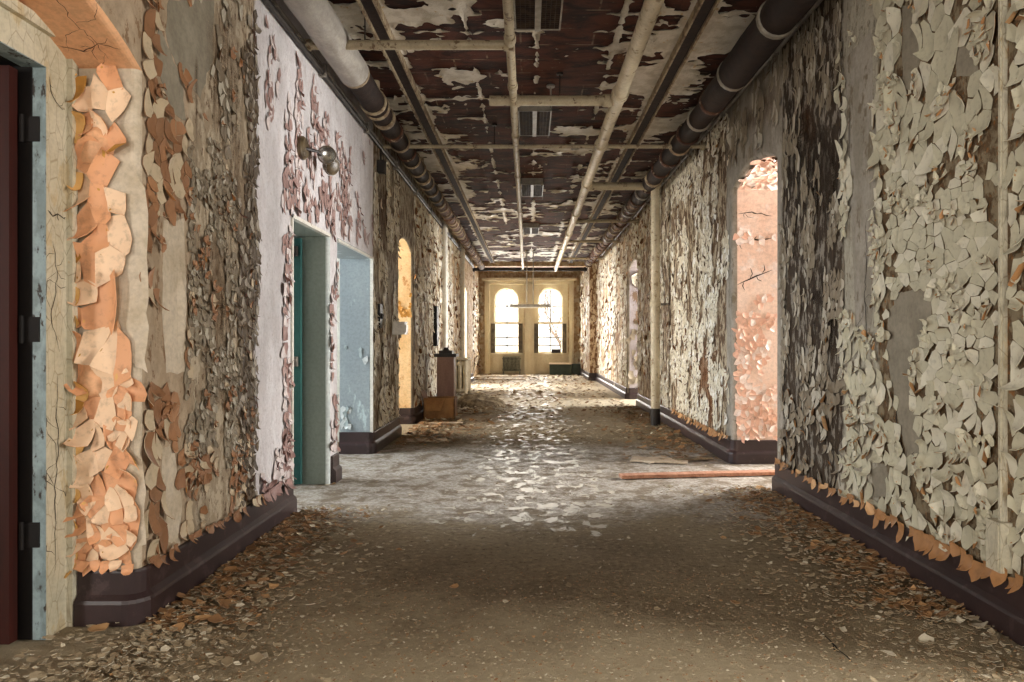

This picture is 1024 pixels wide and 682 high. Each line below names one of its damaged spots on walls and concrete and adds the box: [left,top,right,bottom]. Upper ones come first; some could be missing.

crack [57,1,117,58]
peeling [63,0,484,579]
flaking render [378,0,1024,594]
crack [737,212,771,290]